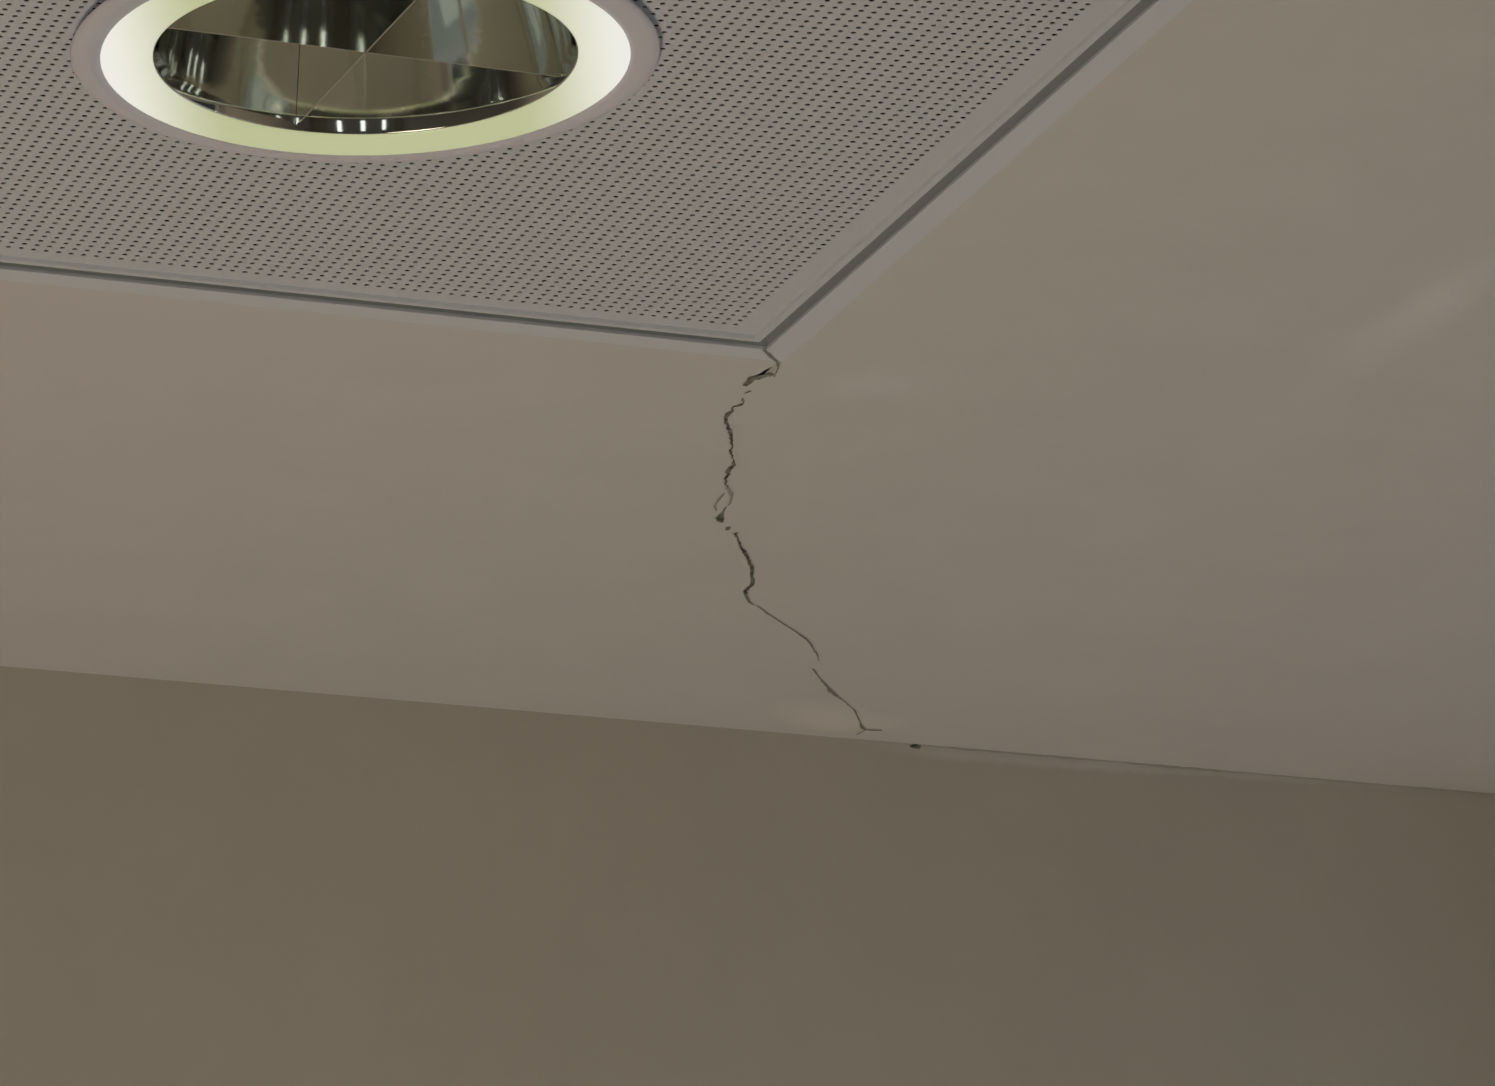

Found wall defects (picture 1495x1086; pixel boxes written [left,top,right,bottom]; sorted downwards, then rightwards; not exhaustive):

crack [713,350,882,735]